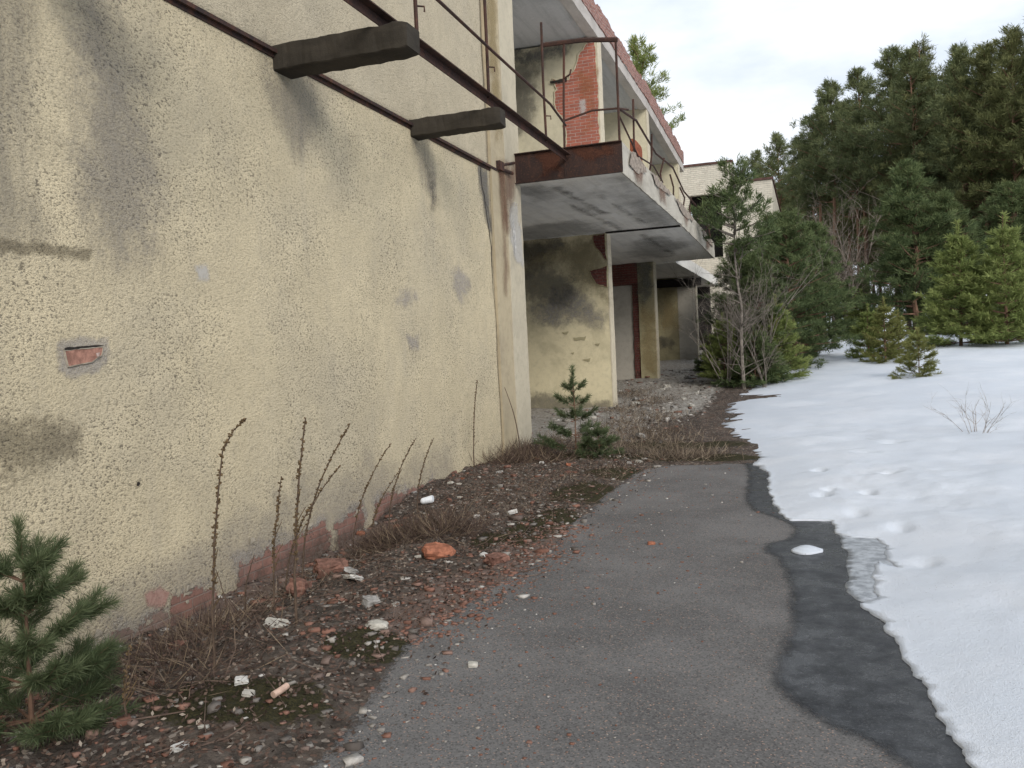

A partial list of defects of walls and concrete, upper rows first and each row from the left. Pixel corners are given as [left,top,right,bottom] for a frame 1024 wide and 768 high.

flaking render [550,43,600,147]
rust [499,166,516,228]
water stain [523,243,599,286]
flaking render [589,233,608,288]
flaking render [62,345,104,368]
flaking render [237,476,434,588]
flaking render [90,583,218,645]